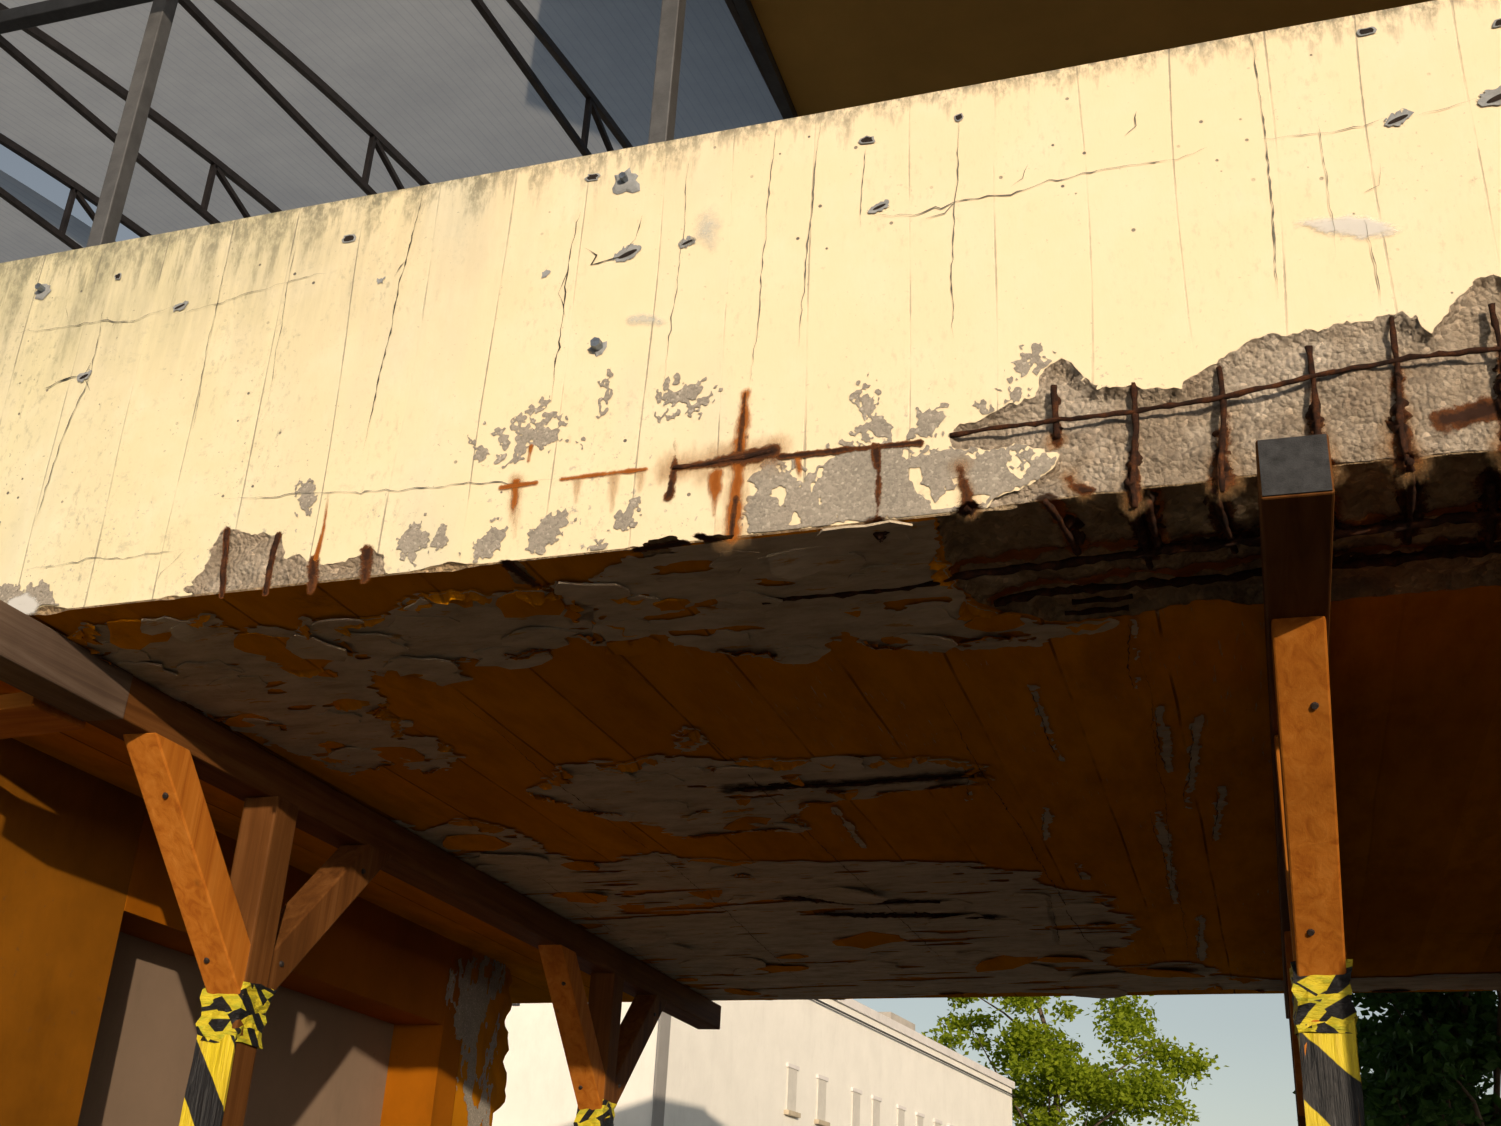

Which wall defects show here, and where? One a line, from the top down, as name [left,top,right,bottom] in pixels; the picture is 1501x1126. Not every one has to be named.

peeling [613,243,642,262]
peeling [678,235,696,248]
crack [750,129,777,379]
crack [799,123,821,339]
crack [860,114,1201,338]
corrosion [313,510,327,561]
corrosion [499,478,538,510]
corrosion [559,467,648,481]
spalling [0,274,1501,776]
corrosion [664,390,924,542]
peeling [391,755,1284,1000]
spalling [445,950,513,1126]